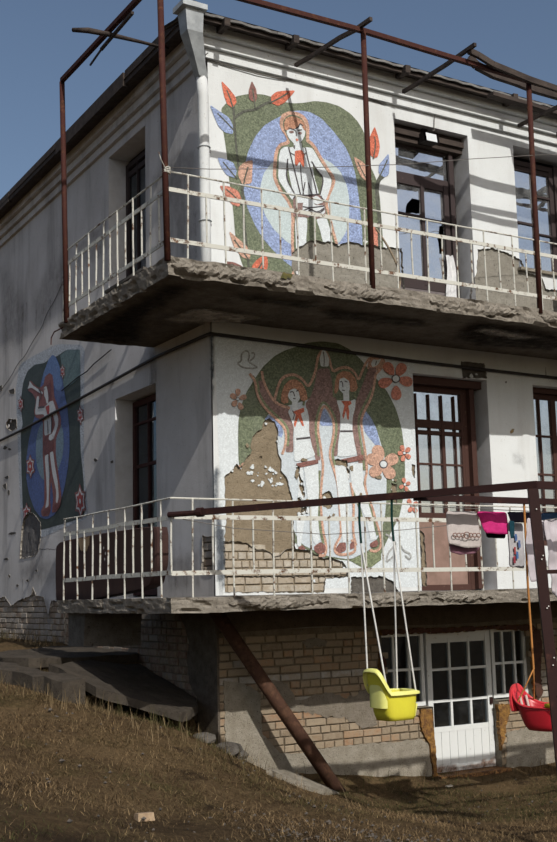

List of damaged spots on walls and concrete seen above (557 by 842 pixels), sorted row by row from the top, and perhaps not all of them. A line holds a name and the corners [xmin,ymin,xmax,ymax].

spalling [430,248,557,322]
spalling [9,512,42,559]
spalling [201,418,421,609]
spalling [418,530,427,586]
flaking render [0,579,67,644]
spalling [431,592,496,602]